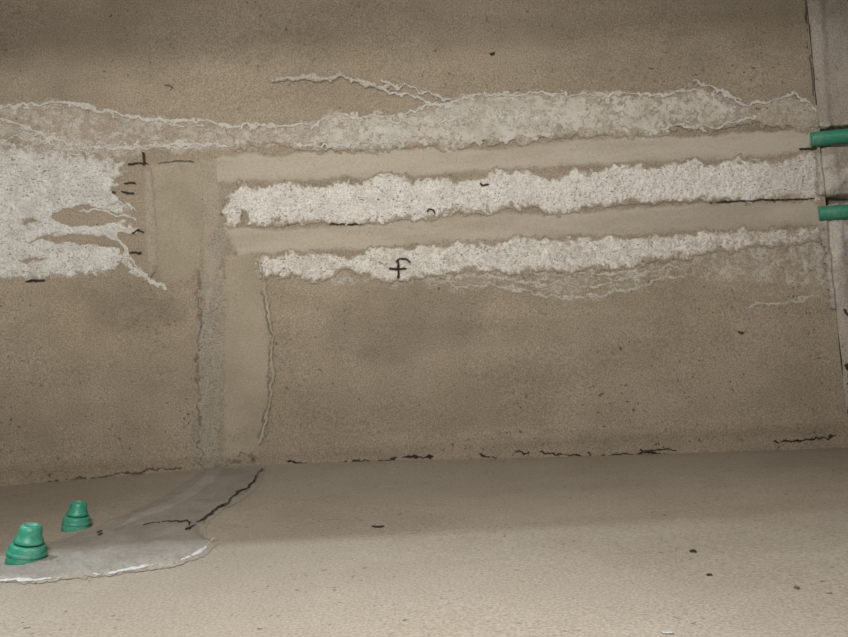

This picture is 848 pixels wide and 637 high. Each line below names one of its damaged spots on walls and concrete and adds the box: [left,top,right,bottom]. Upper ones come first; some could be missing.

leakage [0,70,848,291]
leakage [252,220,848,310]
crack [48,467,181,482]
crack [143,468,263,530]
crack [344,454,434,462]
crack [480,448,676,458]